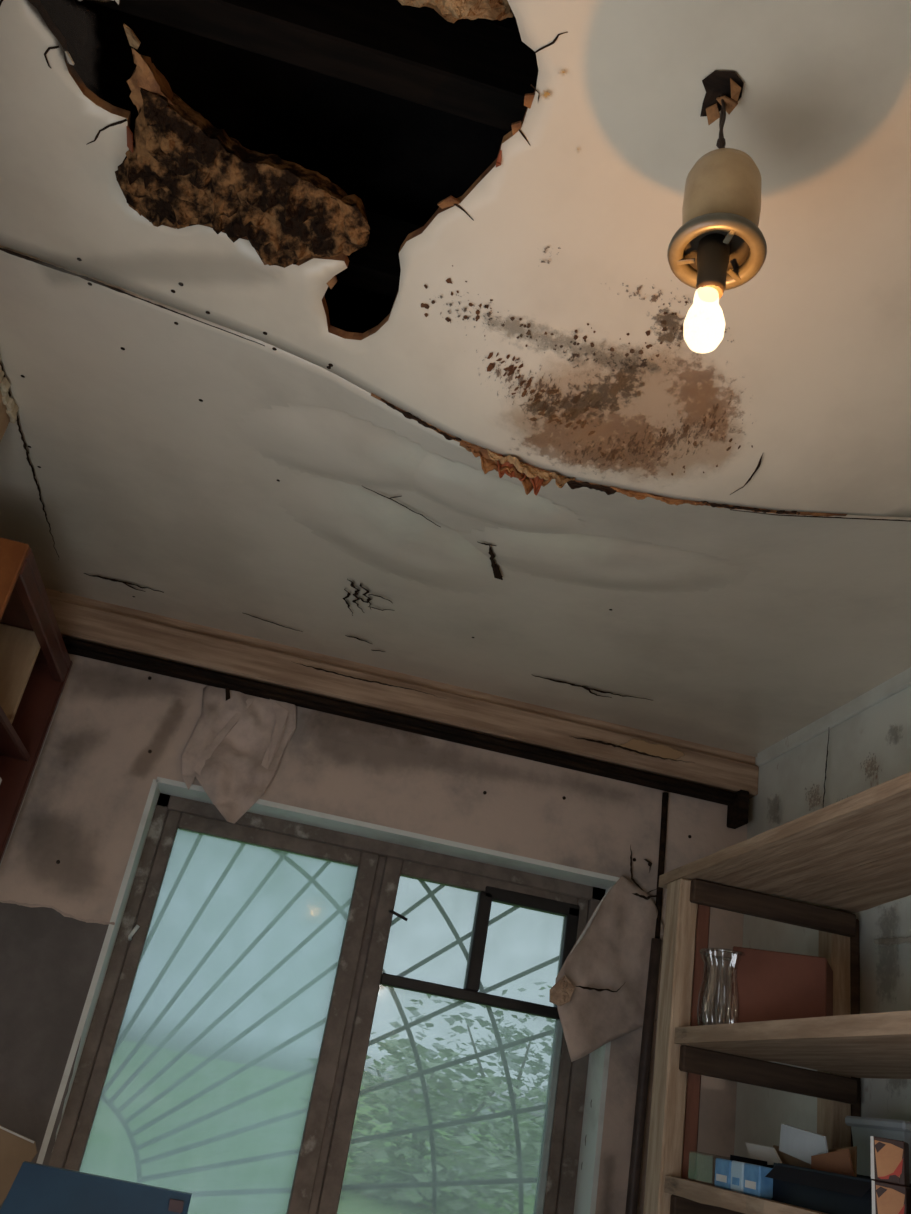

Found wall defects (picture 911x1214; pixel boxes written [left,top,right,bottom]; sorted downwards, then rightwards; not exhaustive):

peeling [123,24,141,49]
crack [535,32,568,53]
crack [44,46,59,68]
peeling [524,93,535,109]
crack [86,119,127,145]
peeling [437,196,461,209]
flaking render [0,899,115,1165]